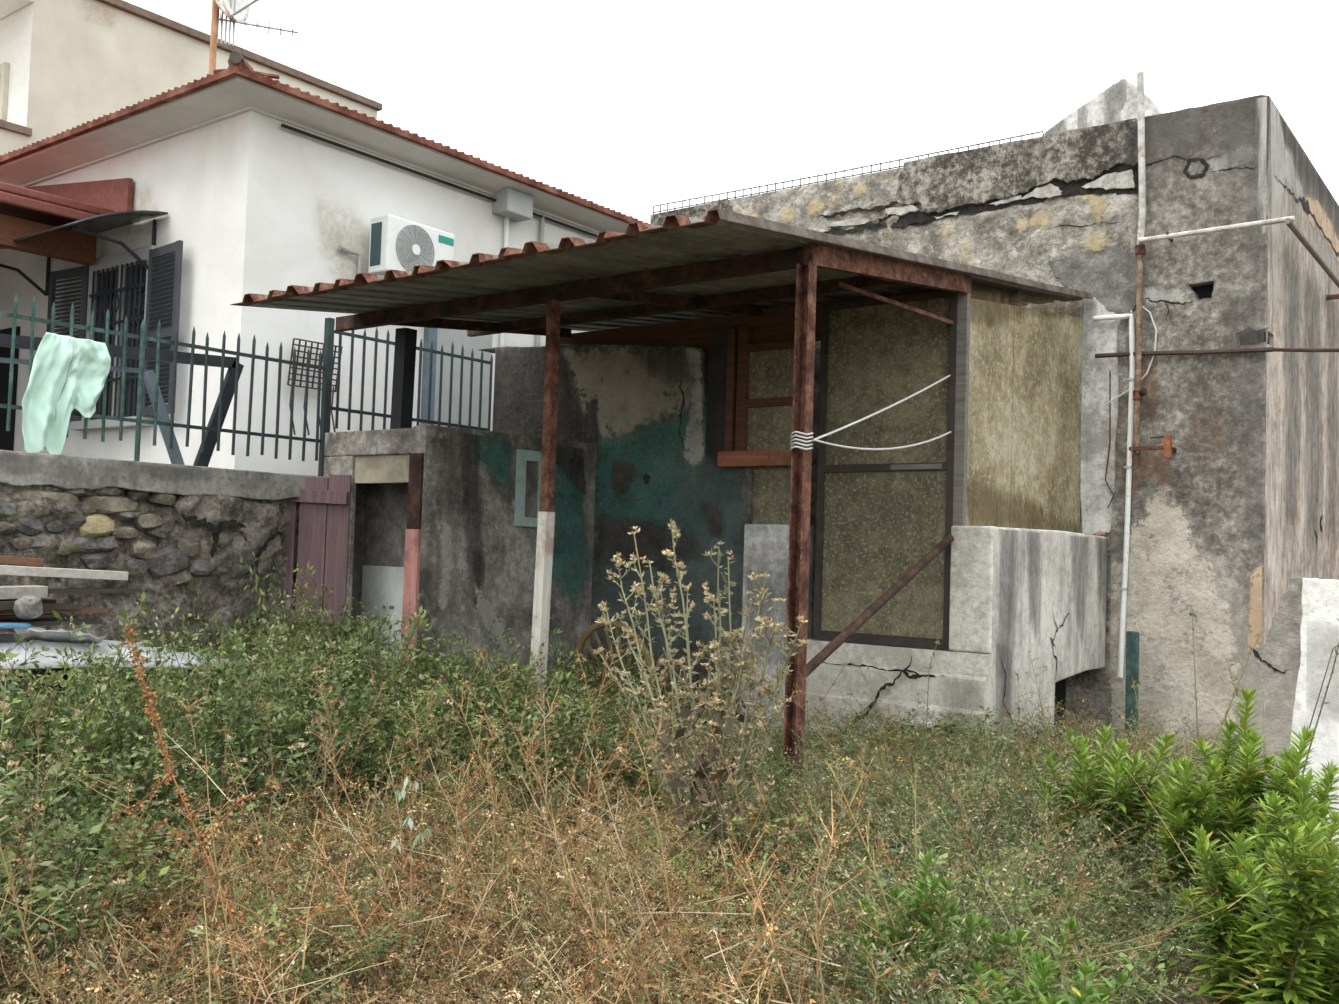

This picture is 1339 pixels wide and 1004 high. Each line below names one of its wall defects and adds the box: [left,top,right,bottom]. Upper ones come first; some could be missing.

crack [810,145,1339,257]
peeling [1306,197,1339,262]